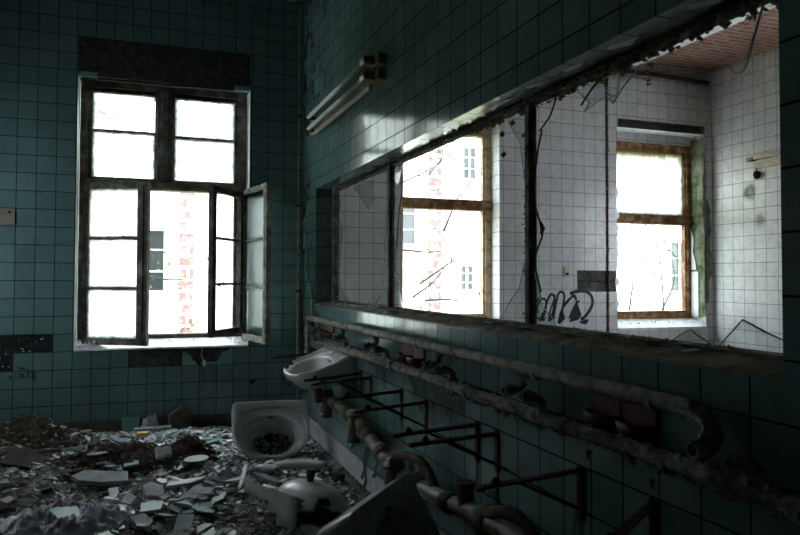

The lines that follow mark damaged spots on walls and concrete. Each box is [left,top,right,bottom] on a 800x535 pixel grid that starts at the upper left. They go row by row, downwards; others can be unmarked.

spalling [680,29,705,43]
spalling [79,37,250,89]
peeling [0,335,53,372]
peeling [129,347,233,367]